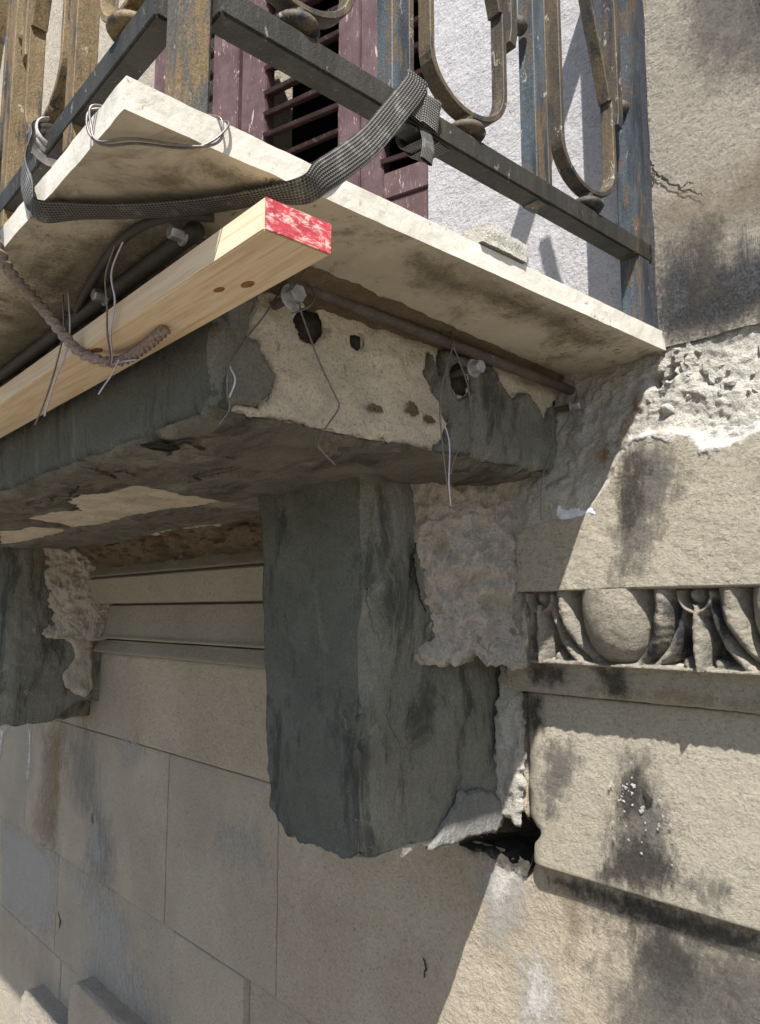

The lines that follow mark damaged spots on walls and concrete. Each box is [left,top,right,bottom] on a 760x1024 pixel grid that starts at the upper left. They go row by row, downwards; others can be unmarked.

crack [649,160,703,197]
damp [654,213,760,338]
spalling [230,292,447,449]
spalling [493,366,559,419]
damp [609,439,683,583]
flaking render [618,420,760,459]
spalling [0,486,263,698]
flaking render [400,479,541,876]
damp [548,750,760,1024]